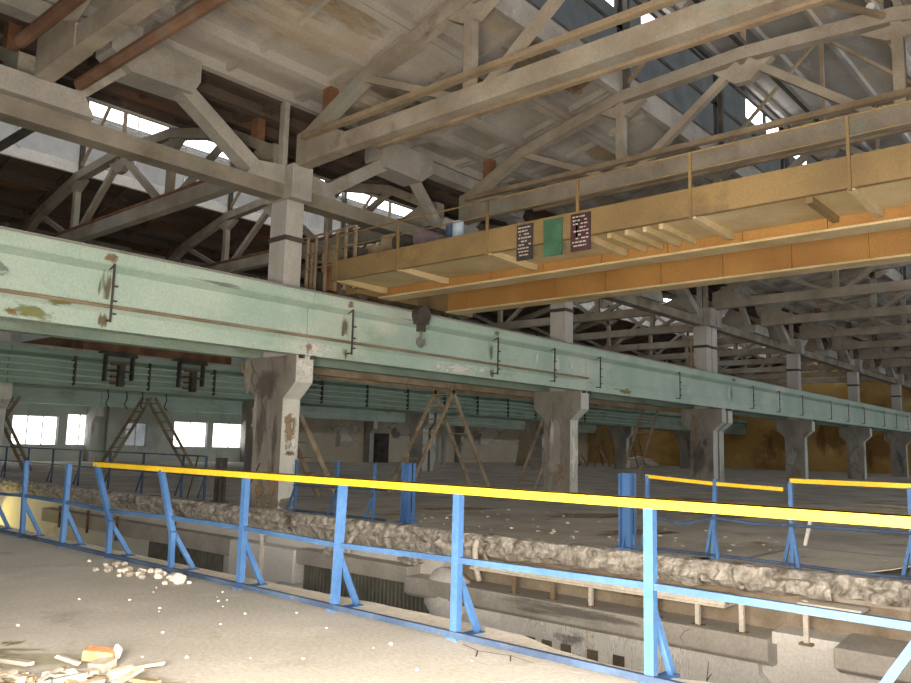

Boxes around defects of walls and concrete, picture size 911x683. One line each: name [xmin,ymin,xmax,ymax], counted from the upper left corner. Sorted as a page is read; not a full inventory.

corrosion [99,254,119,300]
peeling [436,362,486,375]